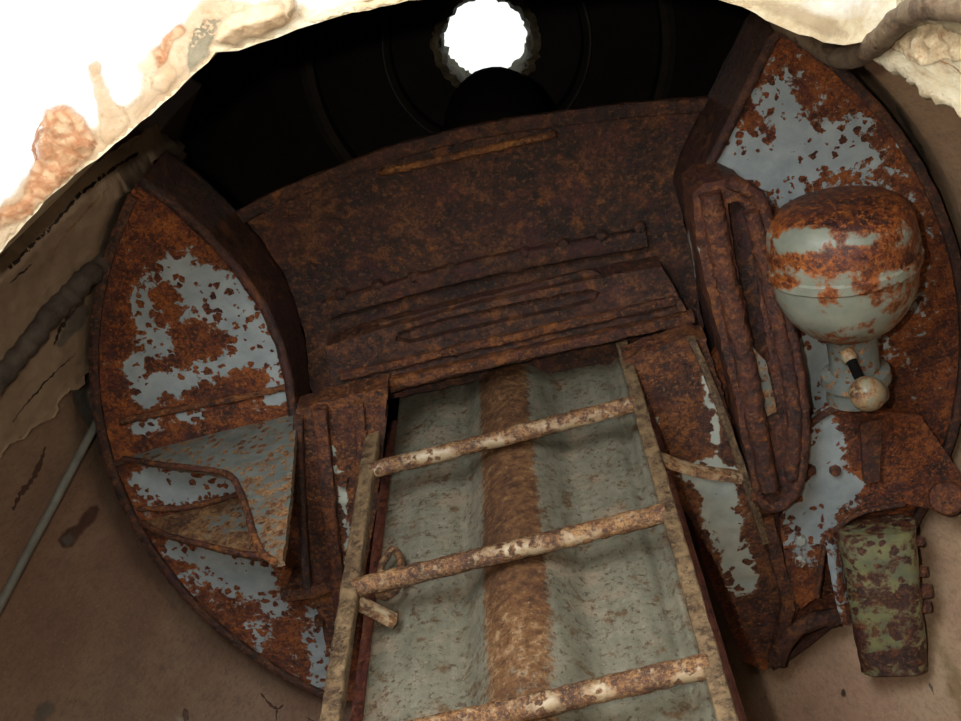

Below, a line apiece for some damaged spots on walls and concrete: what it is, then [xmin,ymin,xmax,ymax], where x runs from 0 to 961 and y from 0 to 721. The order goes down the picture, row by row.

spalling [188,20,221,70]
spalling [888,23,961,112]
spalling [0,125,187,360]
spalling [0,285,99,458]